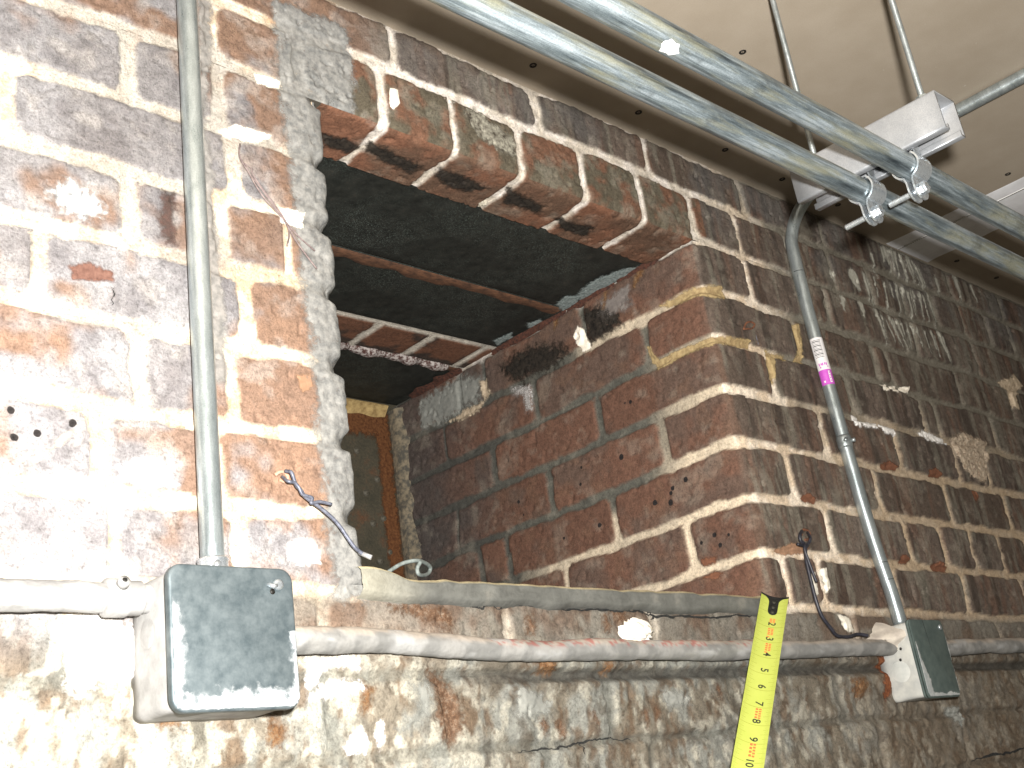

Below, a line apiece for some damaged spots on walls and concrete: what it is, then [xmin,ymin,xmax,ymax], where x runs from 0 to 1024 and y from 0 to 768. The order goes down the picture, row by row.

leakage [950,274,978,303]
leakage [839,245,951,362]
leakage [850,415,896,437]
leakage [918,431,947,445]
crack [518,737,630,754]